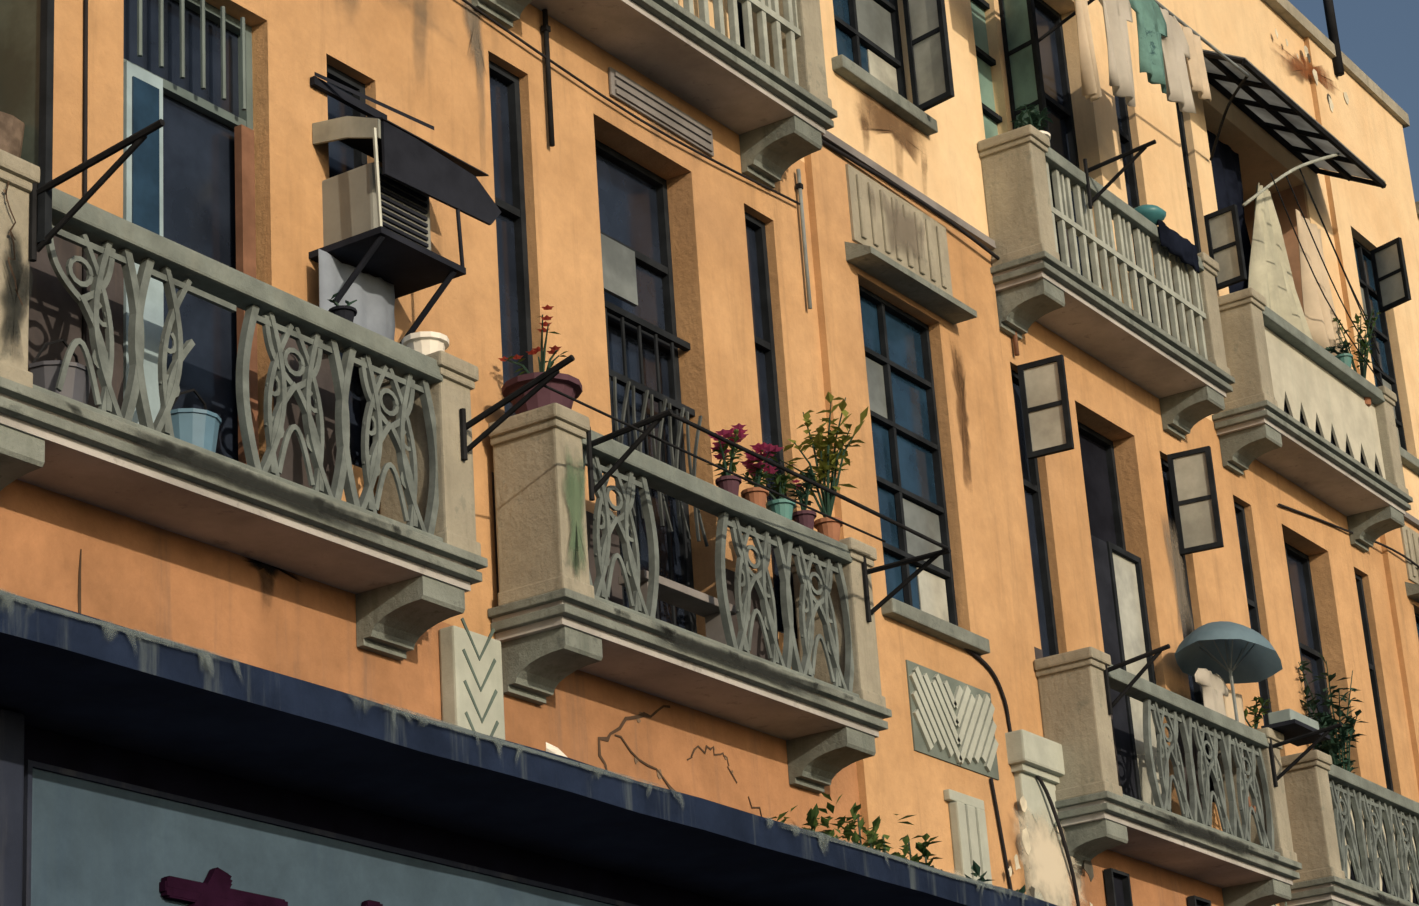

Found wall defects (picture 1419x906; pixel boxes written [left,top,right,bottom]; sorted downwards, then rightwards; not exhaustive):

water stain [10,233,29,289]
water stain [0,590,213,667]
water stain [387,706,650,787]
crack [598,705,762,817]